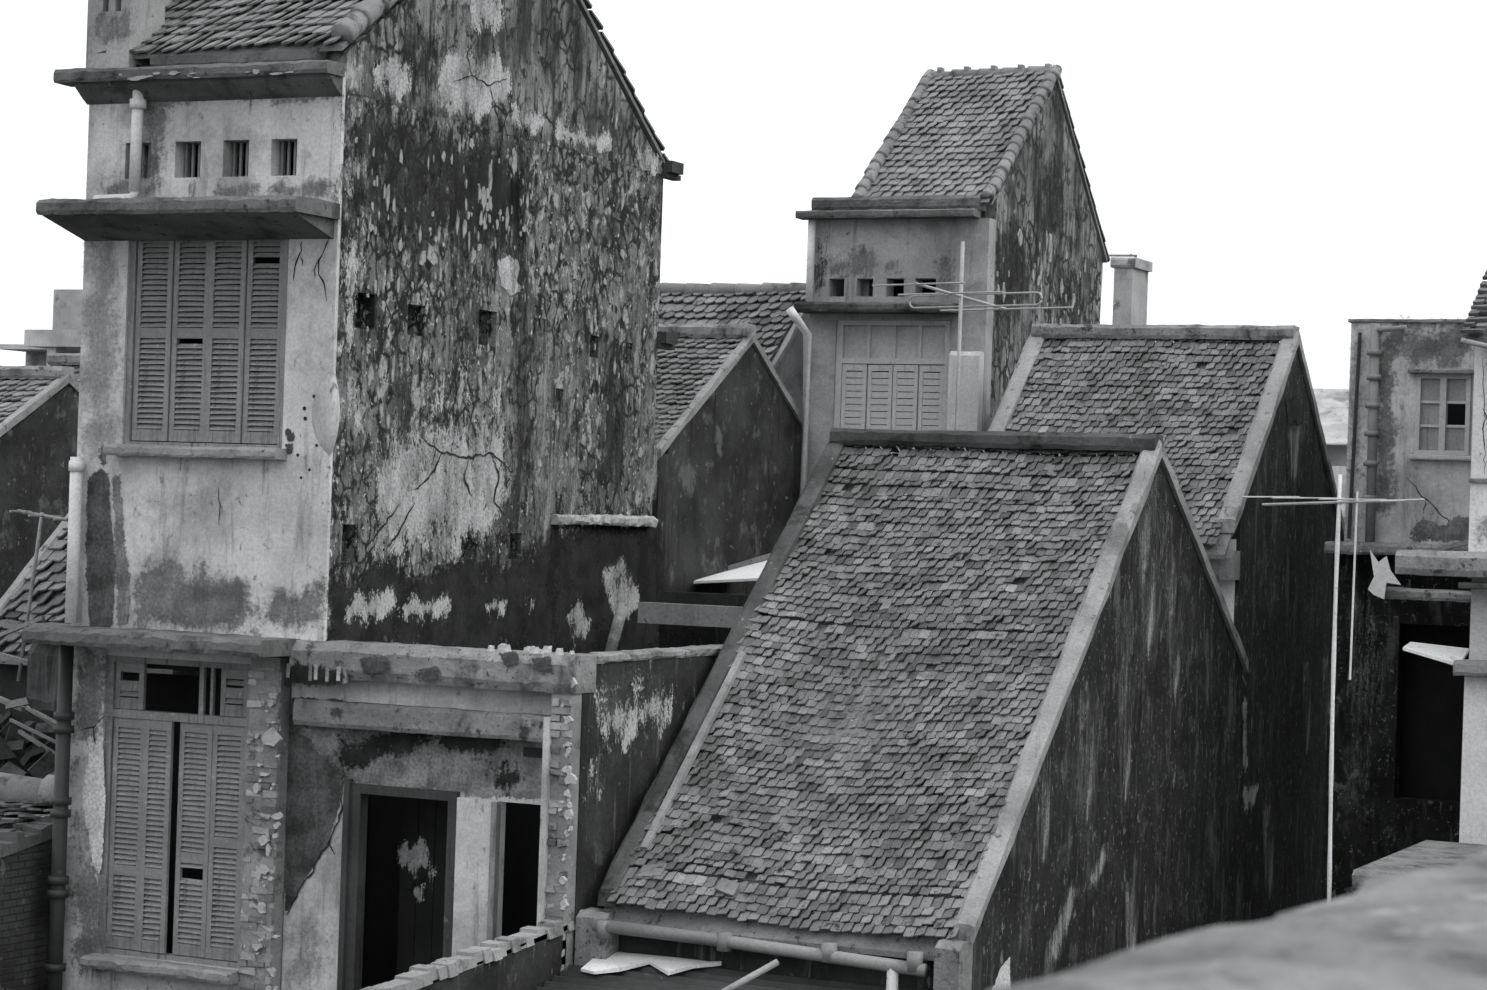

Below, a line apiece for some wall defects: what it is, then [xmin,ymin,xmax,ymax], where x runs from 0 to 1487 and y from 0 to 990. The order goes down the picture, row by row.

damp [132,0,669,653]
flaking render [339,0,662,628]
crack [366,435,513,552]
flaking render [253,656,543,914]
spalling [499,651,578,688]
flaking render [566,596,592,650]
flaking render [558,668,677,910]
flaking render [252,935,281,990]